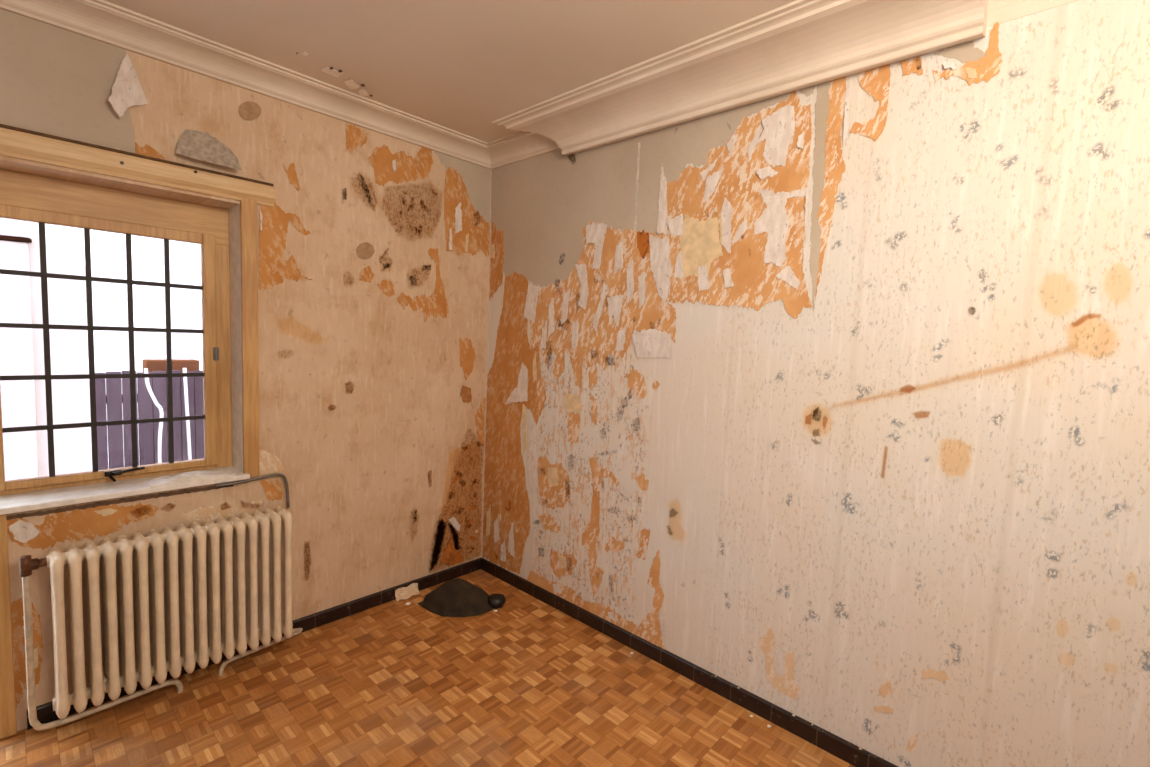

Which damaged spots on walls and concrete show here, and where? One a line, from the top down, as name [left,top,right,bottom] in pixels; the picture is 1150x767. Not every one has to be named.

flaking render [934,41,986,78]
peeling [843,88,851,146]
flaking render [435,81,831,495]
peeling [260,479,284,501]
peeling [7,503,159,550]
peeling [486,504,519,562]